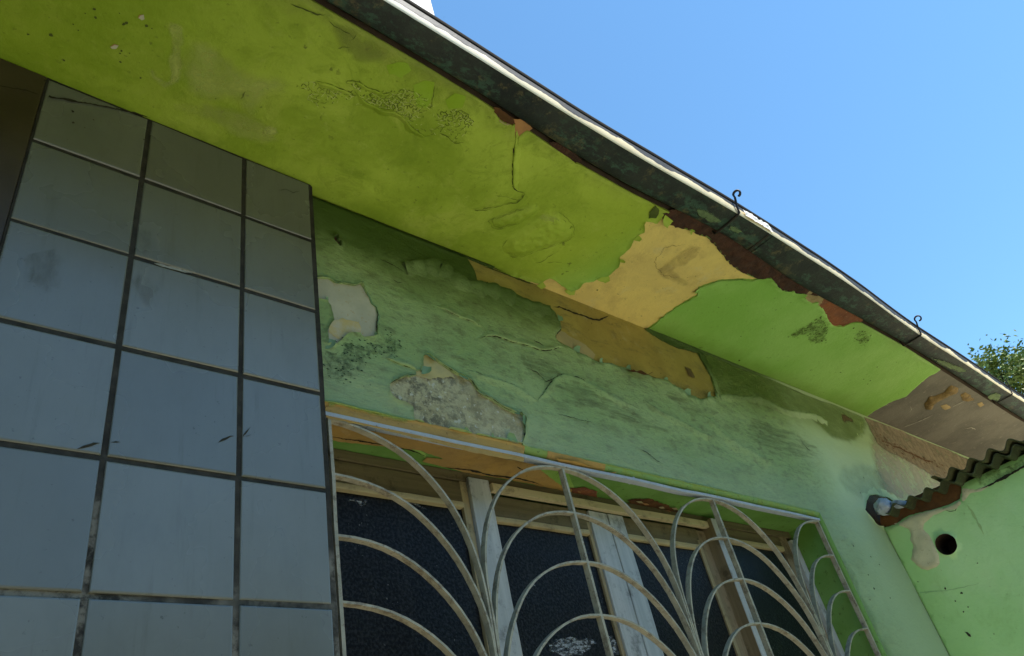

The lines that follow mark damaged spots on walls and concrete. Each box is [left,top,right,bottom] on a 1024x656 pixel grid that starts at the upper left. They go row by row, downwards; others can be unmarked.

crack [475,131,575,263]
peeling [318,279,380,349]
peeling [402,206,863,427]
peeling [325,354,616,497]
flaking render [864,370,1024,527]